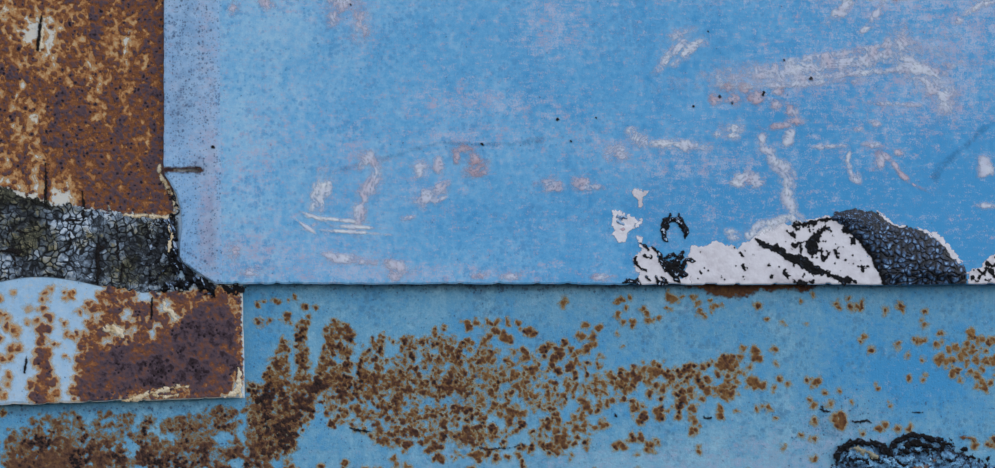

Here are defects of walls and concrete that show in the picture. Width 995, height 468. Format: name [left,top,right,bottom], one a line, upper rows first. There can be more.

corrosion [0,0,204,219]
crack [0,162,179,319]
corrosion [0,284,815,468]
peeling [612,188,883,287]
corrosion [798,376,854,463]
corrosion [832,296,864,312]
corrosion [857,333,876,354]
corrosion [859,421,913,437]
corrosion [882,301,906,317]
peeling [966,254,995,284]